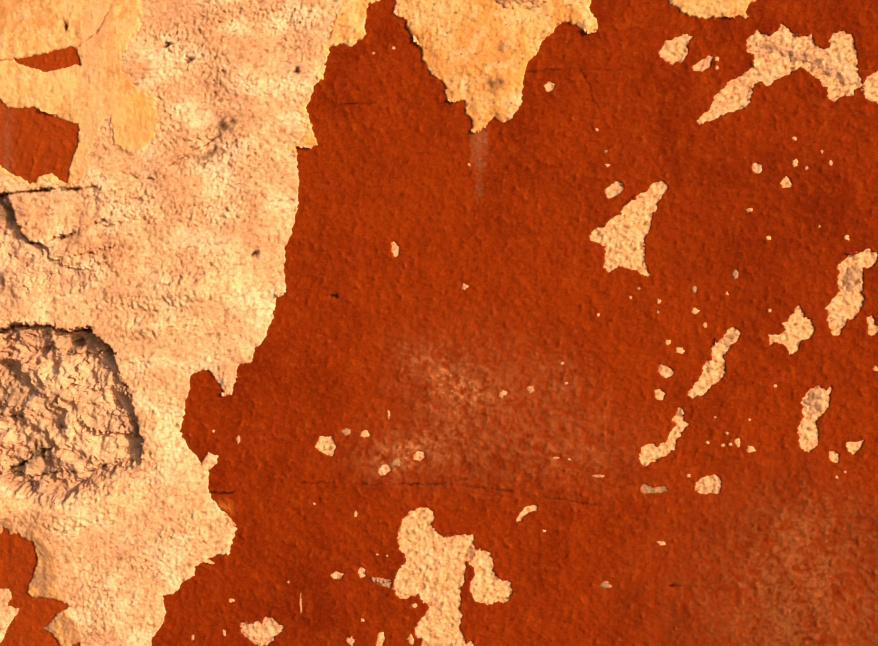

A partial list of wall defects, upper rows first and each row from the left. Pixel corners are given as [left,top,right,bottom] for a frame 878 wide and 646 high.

flaking render [668,0,756,19]
flaking render [393,0,598,133]
peeling [697,24,878,124]
crack [0,187,80,244]
peeling [590,181,668,276]
flaking render [0,0,380,646]
peeling [688,327,741,398]
peeling [768,306,814,355]
peeling [825,249,878,336]
peeling [639,407,689,466]
peeling [797,386,832,452]
peeling [358,507,512,646]